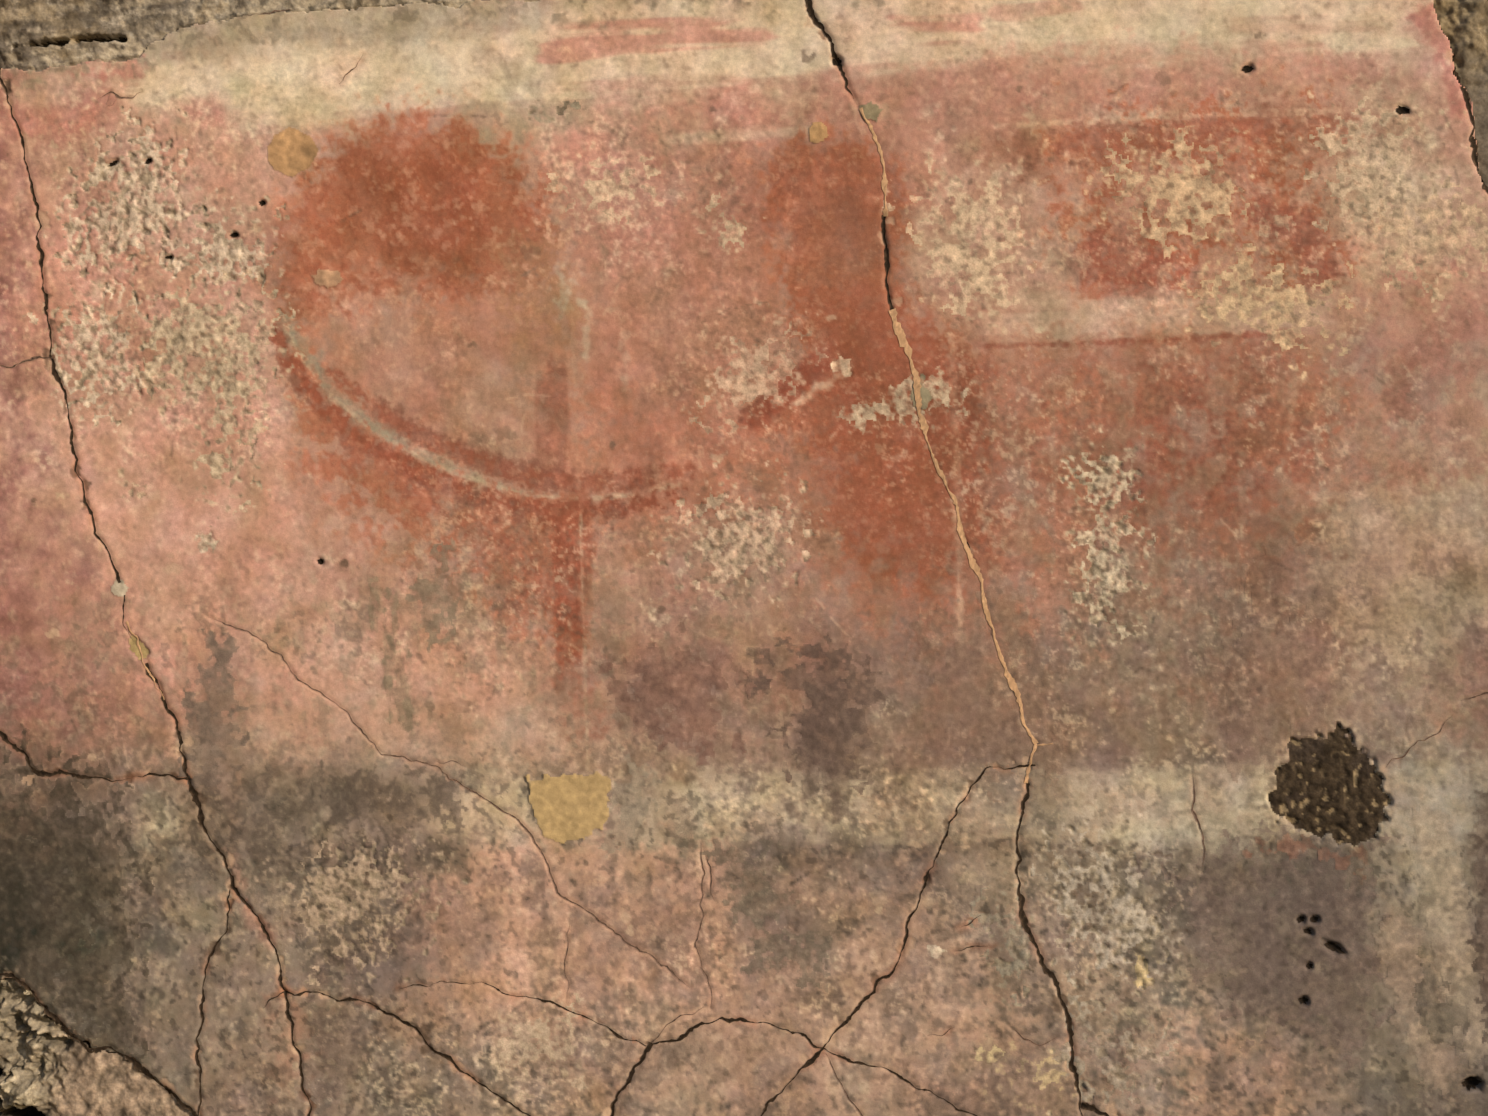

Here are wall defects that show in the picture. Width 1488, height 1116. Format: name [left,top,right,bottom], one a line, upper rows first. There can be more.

crack [805,0,855,101]
crack [1436,11,1488,192]
crack [0,68,1109,1116]
spalling [1268,724,1391,847]
crack [1386,692,1488,767]